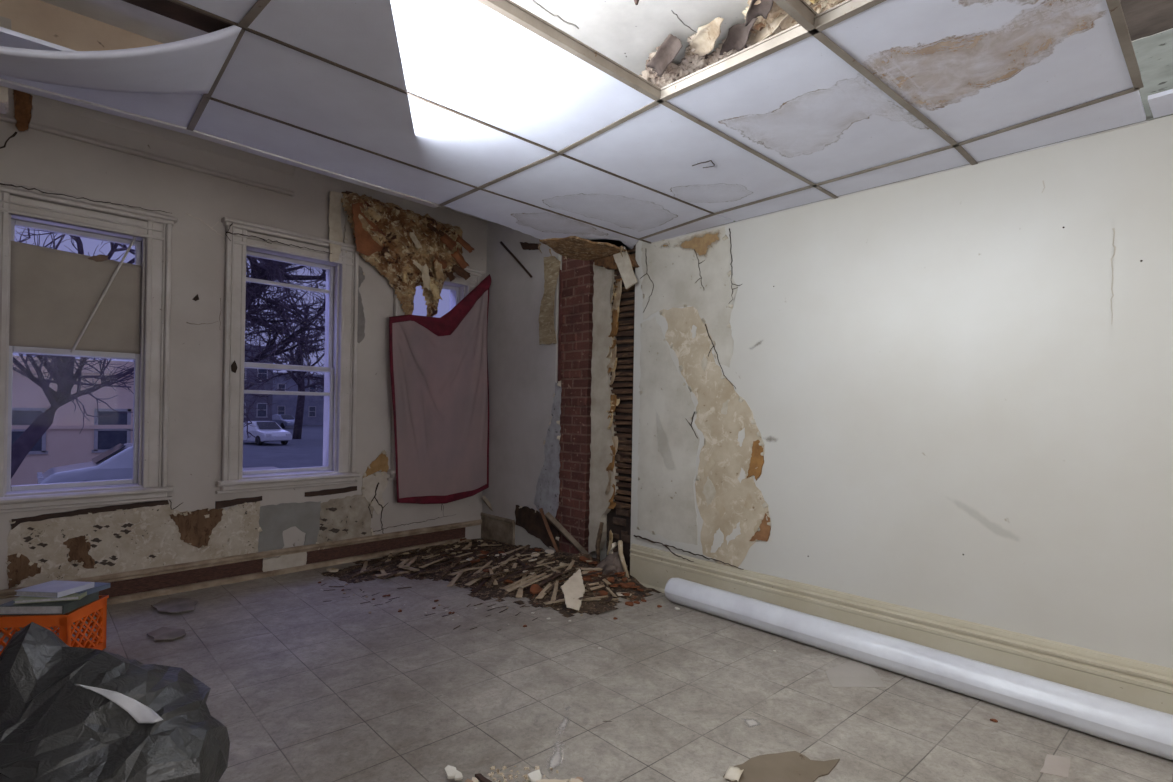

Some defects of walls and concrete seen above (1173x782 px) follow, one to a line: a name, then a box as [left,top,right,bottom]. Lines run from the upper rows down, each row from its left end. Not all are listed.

spalling [639,0,799,88]
spalling [804,0,846,14]
damp [881,34,982,87]
damp [967,68,1021,88]
peeling [328,191,355,262]
peeling [357,266,365,343]
peeling [515,227,771,570]
peeling [5,501,262,589]